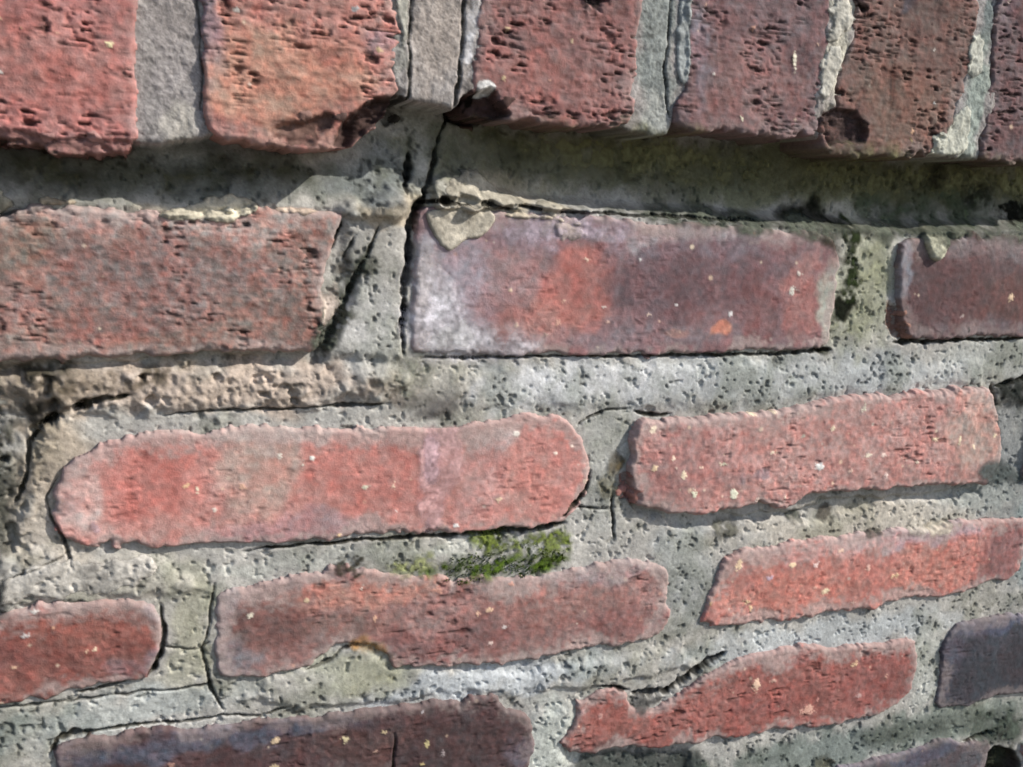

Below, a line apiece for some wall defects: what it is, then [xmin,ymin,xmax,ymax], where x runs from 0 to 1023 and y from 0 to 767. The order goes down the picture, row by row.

crack [398,0,829,360]
crack [322,221,378,344]
crack [177,402,382,413]
crack [15,394,129,562]
crack [601,651,723,695]